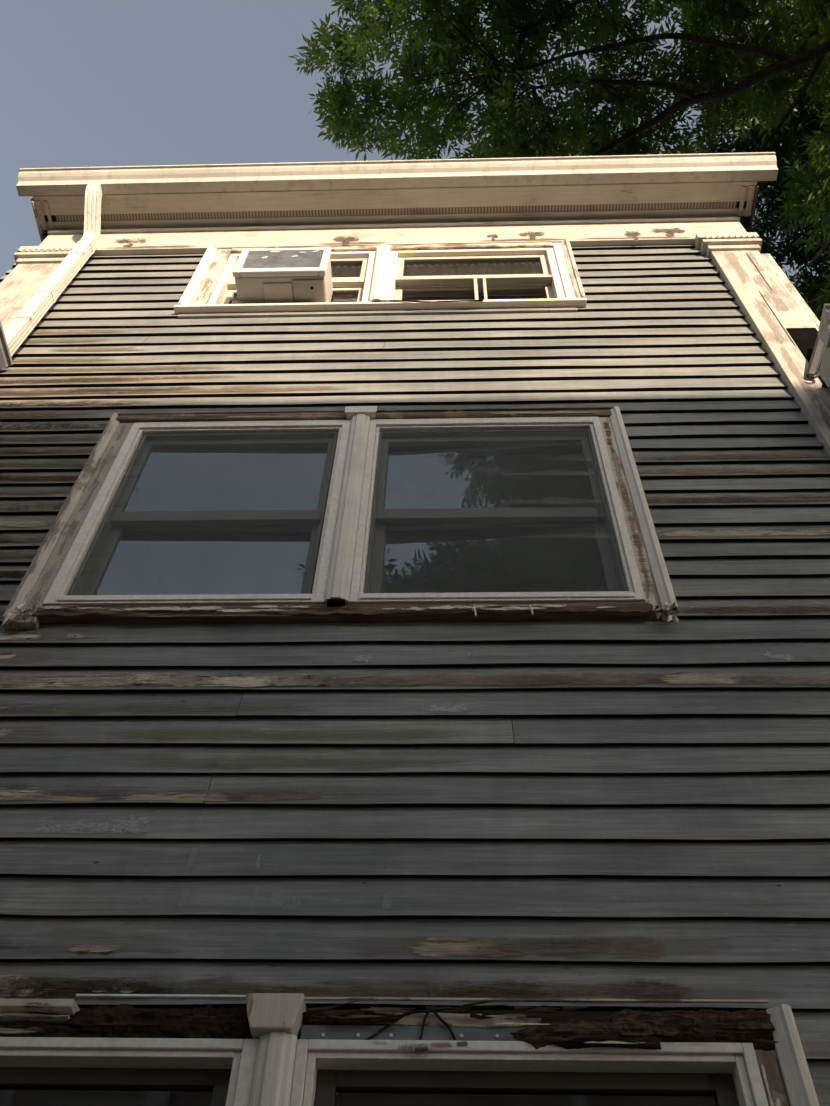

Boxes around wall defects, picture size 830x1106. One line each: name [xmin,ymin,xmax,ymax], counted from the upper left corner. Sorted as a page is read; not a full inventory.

peeling [28,572,309,617]
peeling [678,606,830,614]
peeling [0,633,86,662]
peeling [0,670,830,688]
peeling [0,784,346,802]
peeling [0,974,162,999]
water stain [0,978,700,1003]